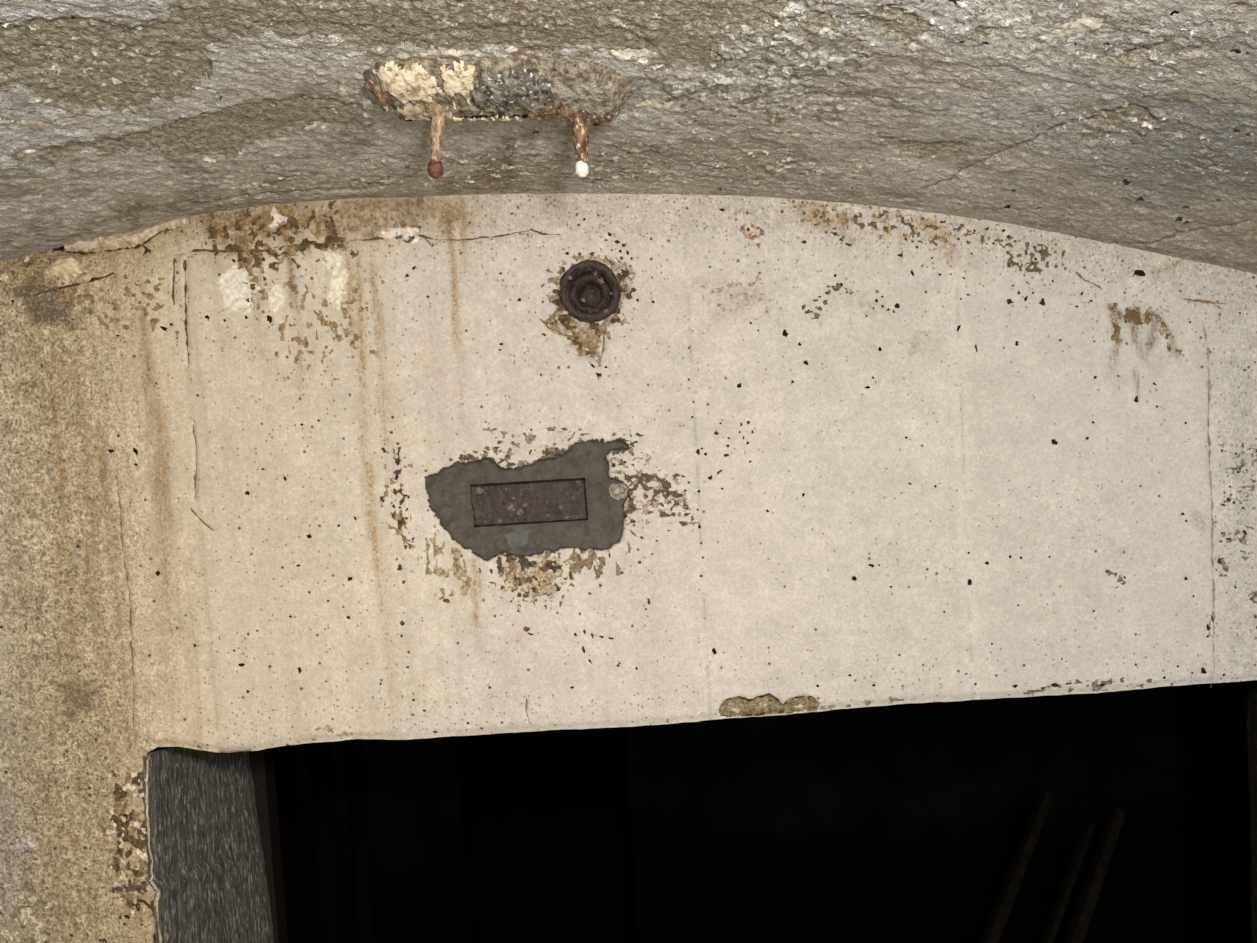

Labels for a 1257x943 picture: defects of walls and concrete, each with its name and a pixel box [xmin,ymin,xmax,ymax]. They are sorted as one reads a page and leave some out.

rust [325,181,464,314]
peeling [380,416,754,614]
spalling [96,767,154,930]